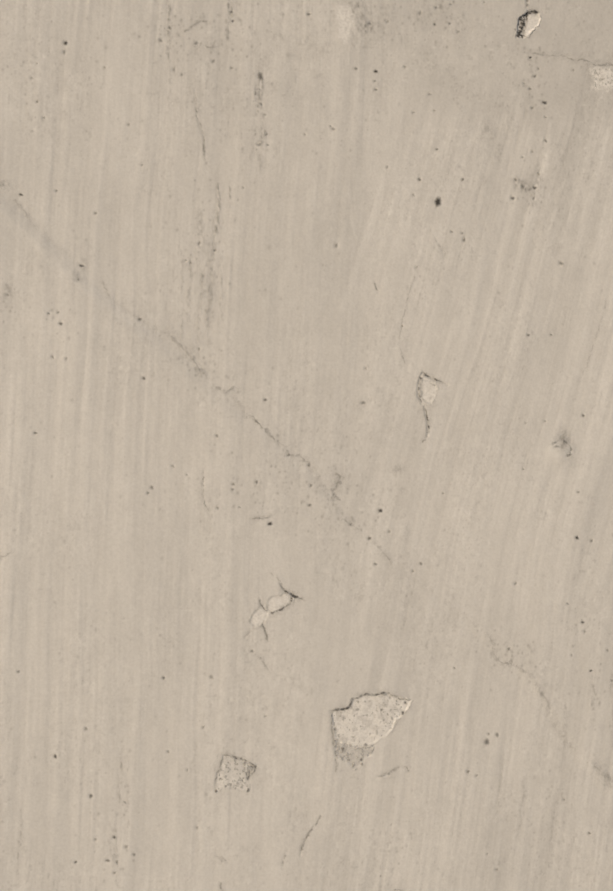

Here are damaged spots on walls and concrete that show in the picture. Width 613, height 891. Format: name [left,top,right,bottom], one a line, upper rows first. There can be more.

spalling [518,10,541,38]
peeling [587,62,613,94]
spalling [248,591,298,636]
spalling [330,692,412,765]
spalling [215,754,256,792]